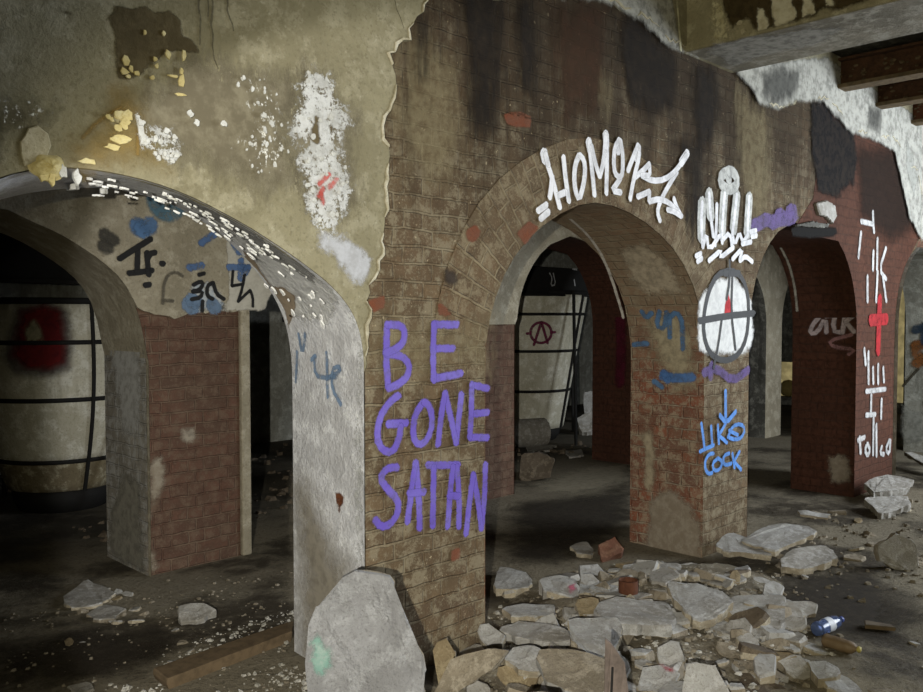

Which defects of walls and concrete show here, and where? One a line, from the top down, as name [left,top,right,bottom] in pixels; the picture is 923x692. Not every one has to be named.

flaking render [104,6,371,282]
water stain [466,0,503,133]
water stain [621,0,682,114]
flaking render [354,0,920,668]